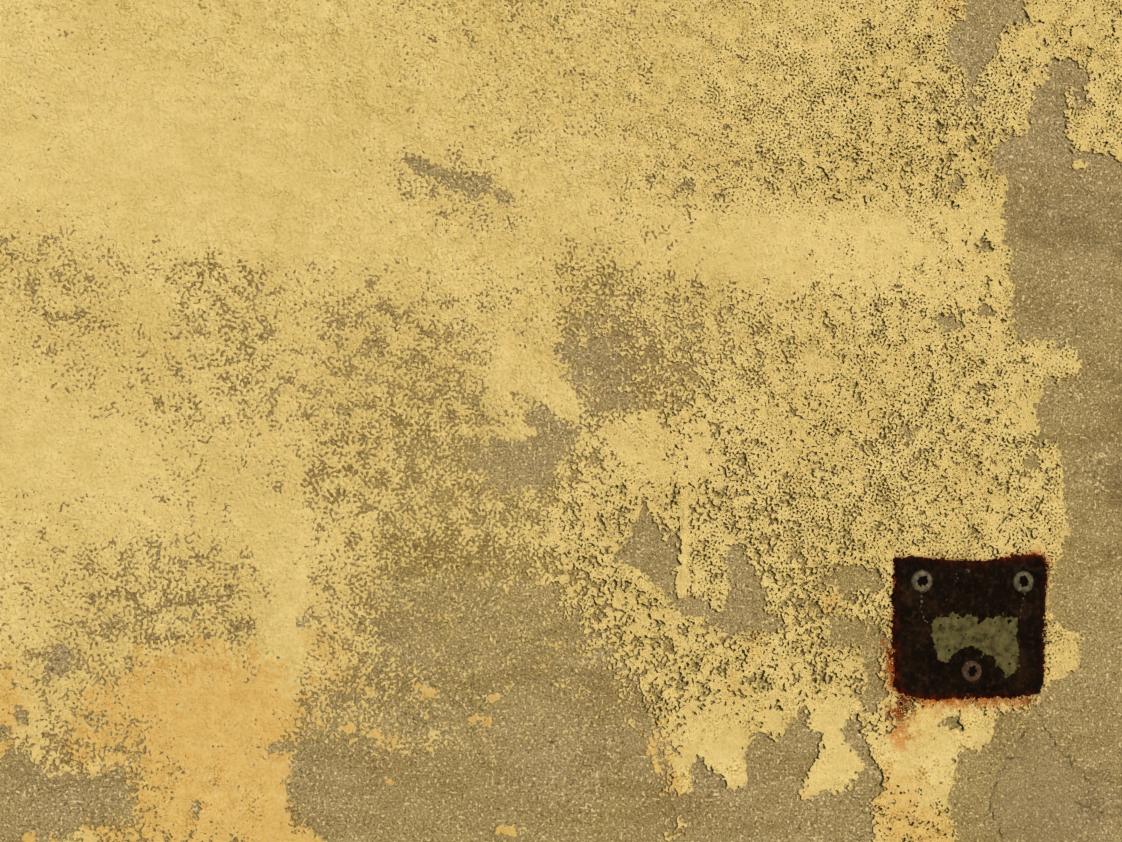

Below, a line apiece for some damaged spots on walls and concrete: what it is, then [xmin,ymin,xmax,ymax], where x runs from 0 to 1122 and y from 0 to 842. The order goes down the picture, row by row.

peeling [1100,0,1122,46]
peeling [975,236,995,257]
peeling [648,369,687,386]
peeling [414,448,438,471]
peeling [400,541,426,568]
peeling [446,541,479,573]
corrosion [881,552,1050,720]
peeling [0,705,135,842]